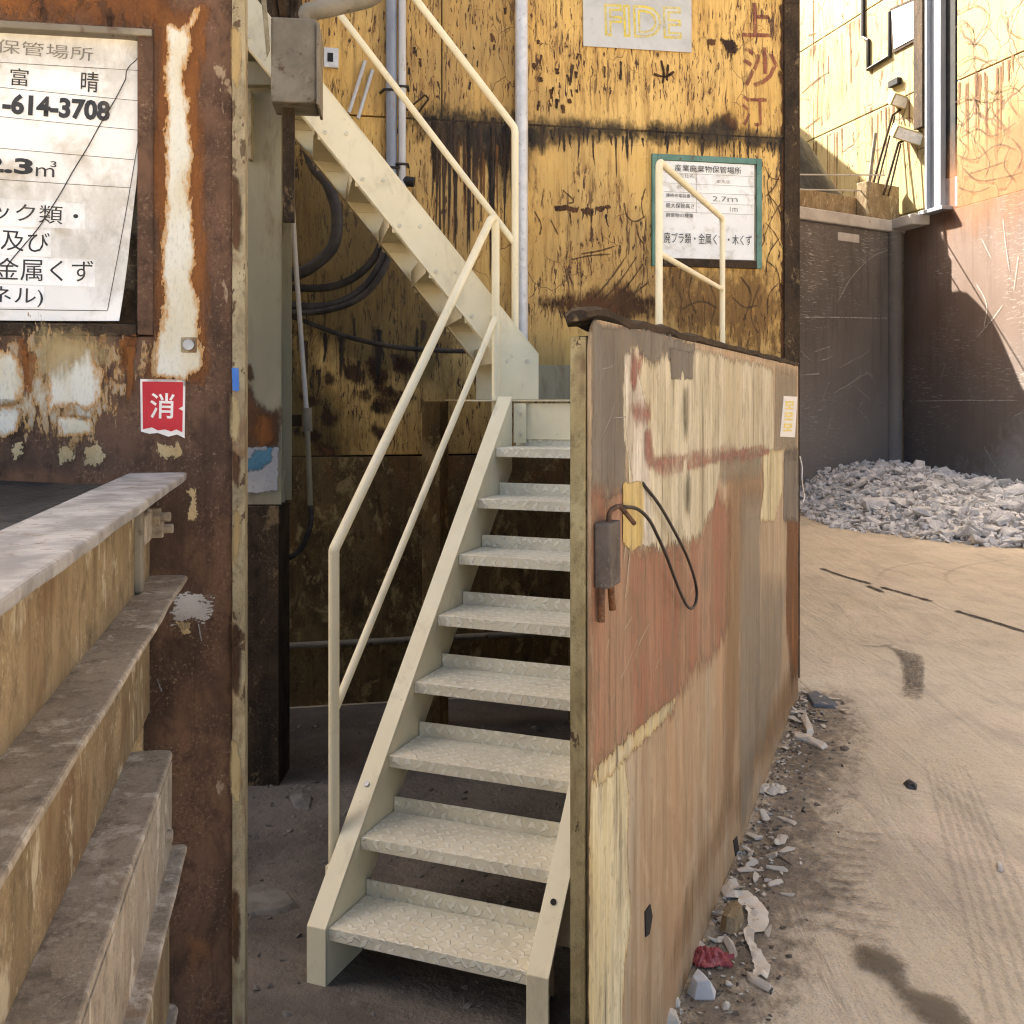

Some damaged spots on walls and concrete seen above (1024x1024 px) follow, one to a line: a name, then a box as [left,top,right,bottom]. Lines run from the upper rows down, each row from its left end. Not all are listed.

peeling [0,5,210,467]
water stain [292,146,444,458]
water stain [406,106,515,280]
water stain [528,110,784,176]
peeling [186,488,198,521]
peeling [175,621,191,635]